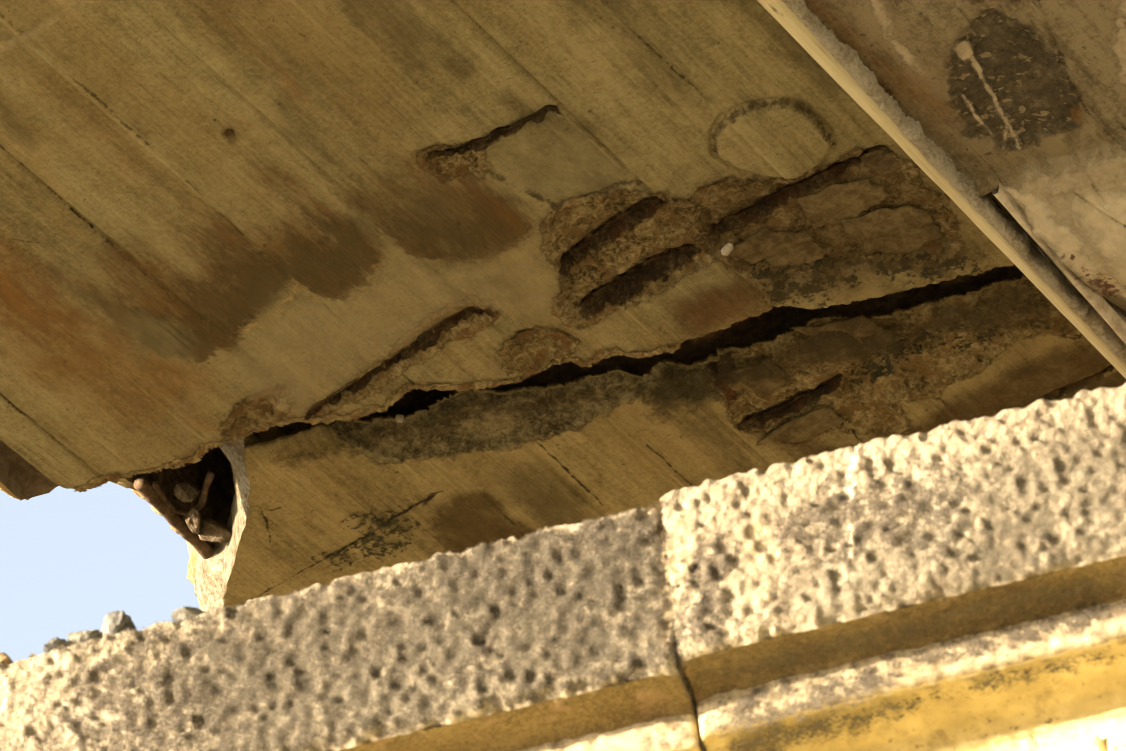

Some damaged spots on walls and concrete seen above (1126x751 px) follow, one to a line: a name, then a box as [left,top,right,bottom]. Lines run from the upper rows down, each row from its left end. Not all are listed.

spalling [417,104,561,183]
peeling [711,98,835,155]
damp [113,204,382,362]
spalling [74,145,1082,526]
damp [433,493,533,554]
crack [657,501,668,659]
damp [698,600,1126,751]